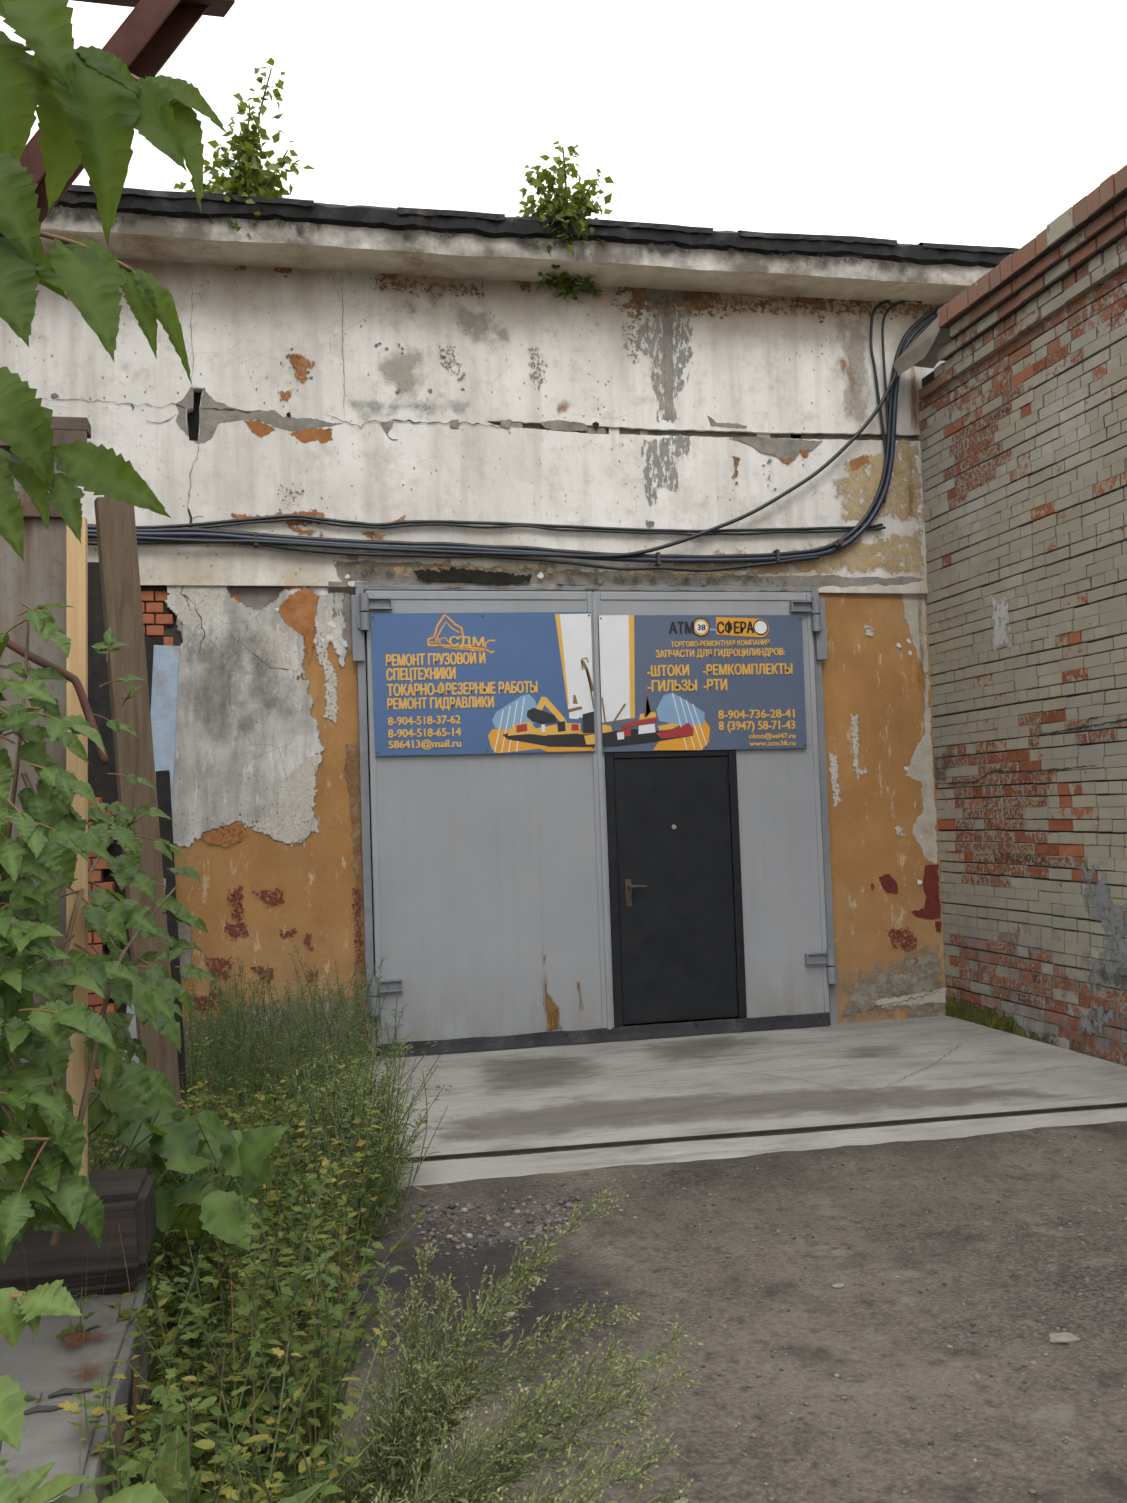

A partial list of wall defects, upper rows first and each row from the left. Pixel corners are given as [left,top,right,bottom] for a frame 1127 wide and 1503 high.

spalling [148,348,343,444]
crack [327,285,511,440]
leakage [636,288,696,527]
peeling [944,267,1127,509]
peeling [231,483,328,536]
peeling [141,560,1115,887]
spalling [344,743,365,989]
spalling [178,922,192,979]
corrosion [544,985,559,1031]
peeling [949,935,1127,1066]